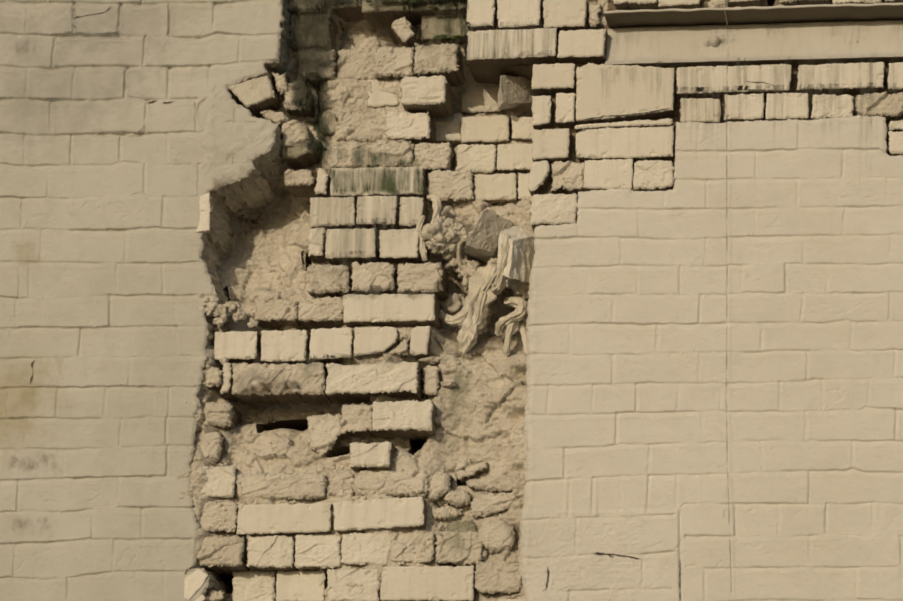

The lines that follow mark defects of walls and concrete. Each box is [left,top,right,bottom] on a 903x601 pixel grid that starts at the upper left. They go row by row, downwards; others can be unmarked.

spalling [176,0,535,601]
crack [594,552,640,565]